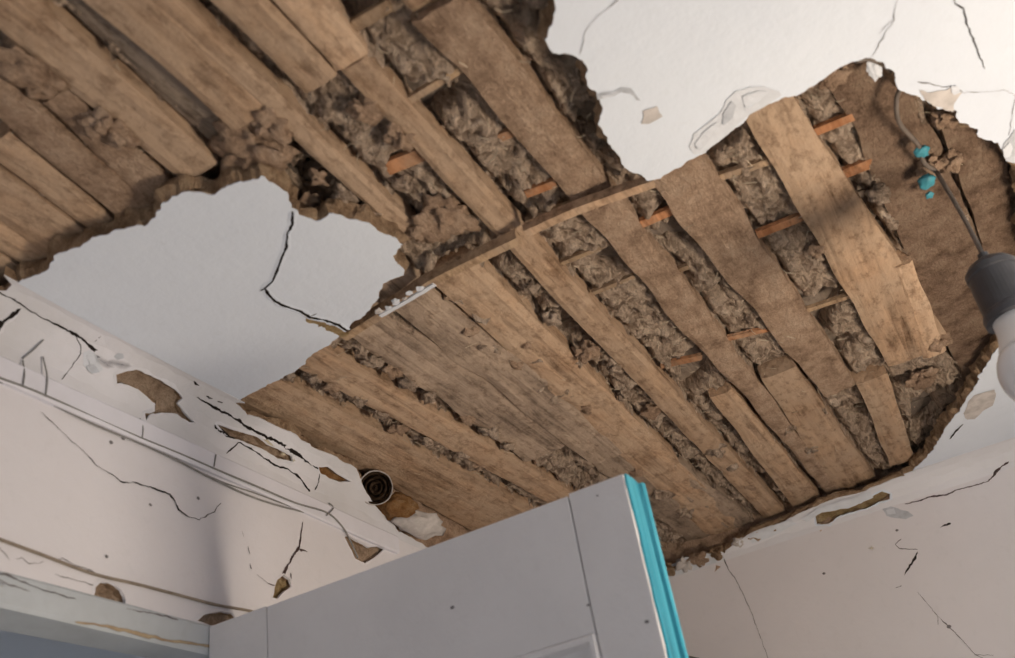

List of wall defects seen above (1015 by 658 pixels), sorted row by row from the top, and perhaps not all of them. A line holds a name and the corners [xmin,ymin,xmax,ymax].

peeling [689,87,781,155]
peeling [866,62,882,82]
peeling [920,86,961,112]
crack [919,0,1015,133]
peeling [1002,130,1015,163]
crack [260,210,350,337]
crack [0,292,101,379]
spalling [83,349,196,425]
crack [44,414,221,520]
crack [242,522,307,586]
spalling [662,464,913,576]
crack [905,462,1009,504]